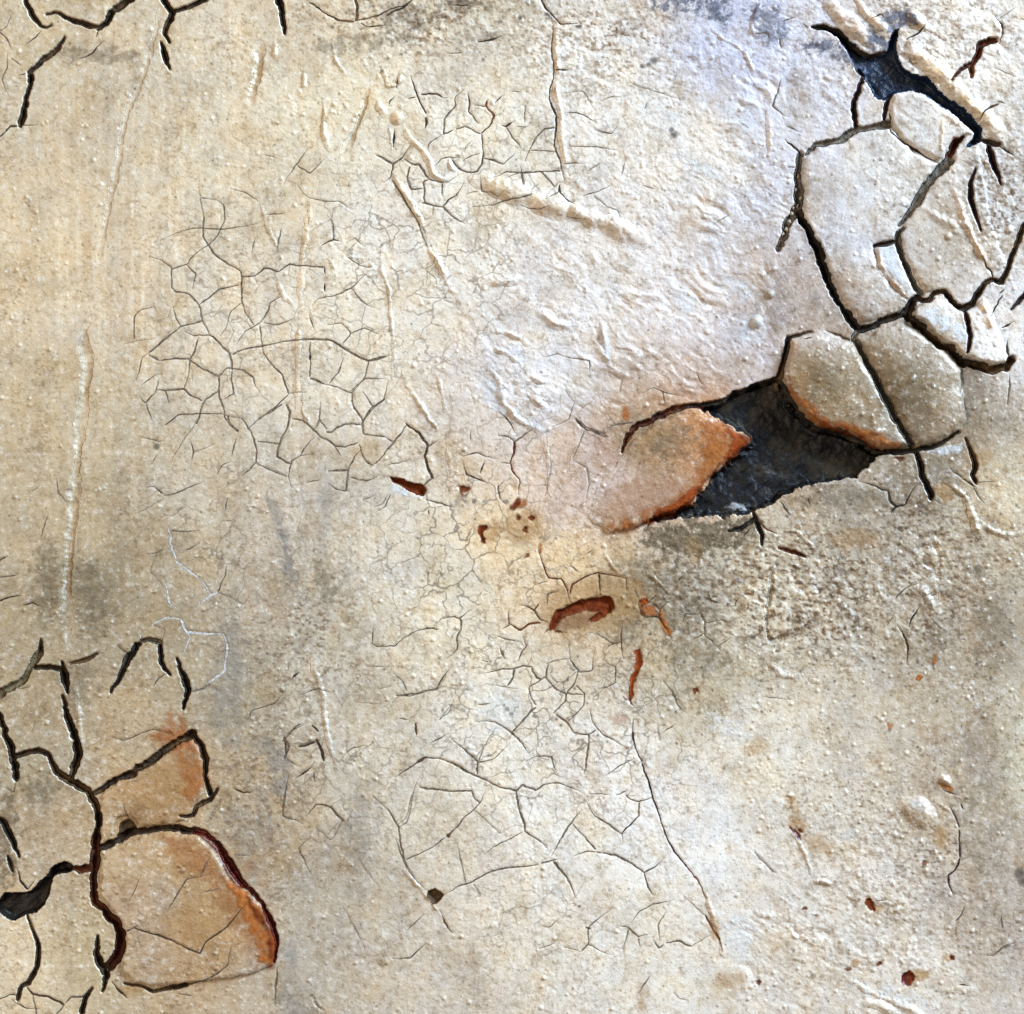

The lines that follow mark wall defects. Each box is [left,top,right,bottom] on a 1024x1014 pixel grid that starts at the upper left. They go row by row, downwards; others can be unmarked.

crack [0,0,134,137]
crack [161,0,207,69]
crack [276,0,286,34]
crack [545,8,1024,513]
crack [462,413,530,504]
spalling [588,380,883,533]
corrosion [478,525,498,544]
corrosion [505,498,535,533]
crack [0,149,451,1014]
corrosion [640,598,672,635]
corrosion [628,649,643,699]
crack [359,550,738,959]